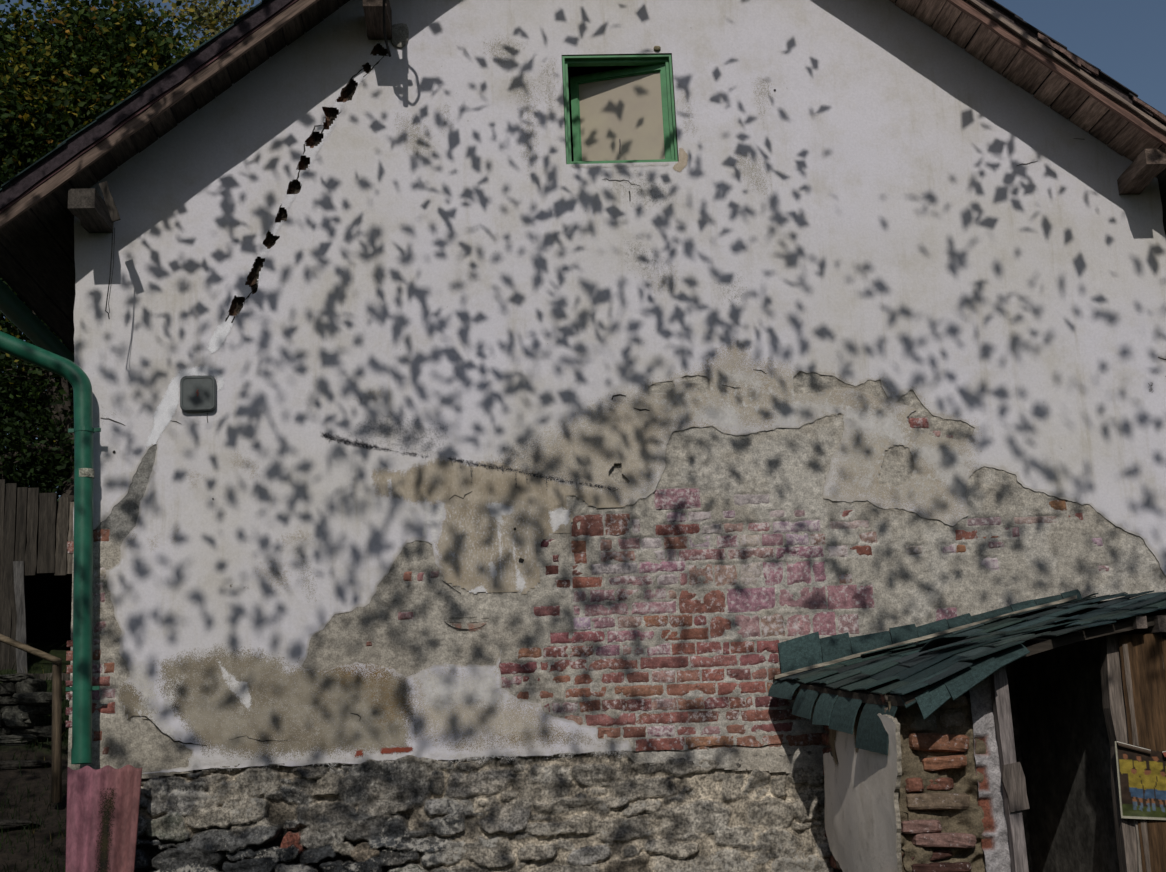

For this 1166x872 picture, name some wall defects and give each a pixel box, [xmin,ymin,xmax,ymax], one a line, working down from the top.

crack [344,56,384,89]
crack [296,125,325,181]
flaking render [65,344,1166,778]